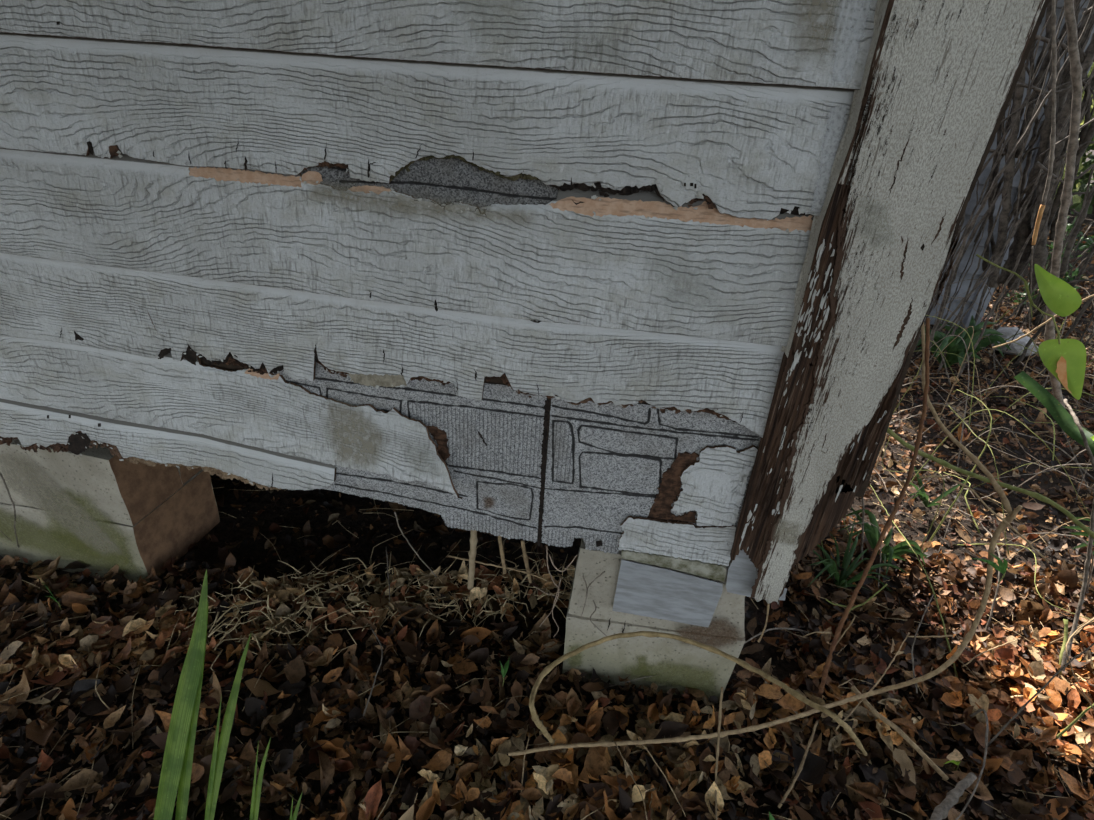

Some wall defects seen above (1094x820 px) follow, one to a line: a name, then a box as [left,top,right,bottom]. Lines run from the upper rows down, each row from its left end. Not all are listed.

peeling [188,160,331,188]
peeling [549,0,965,567]
peeling [183,349,280,382]
peeling [330,372,430,389]
crack [537,382,550,547]